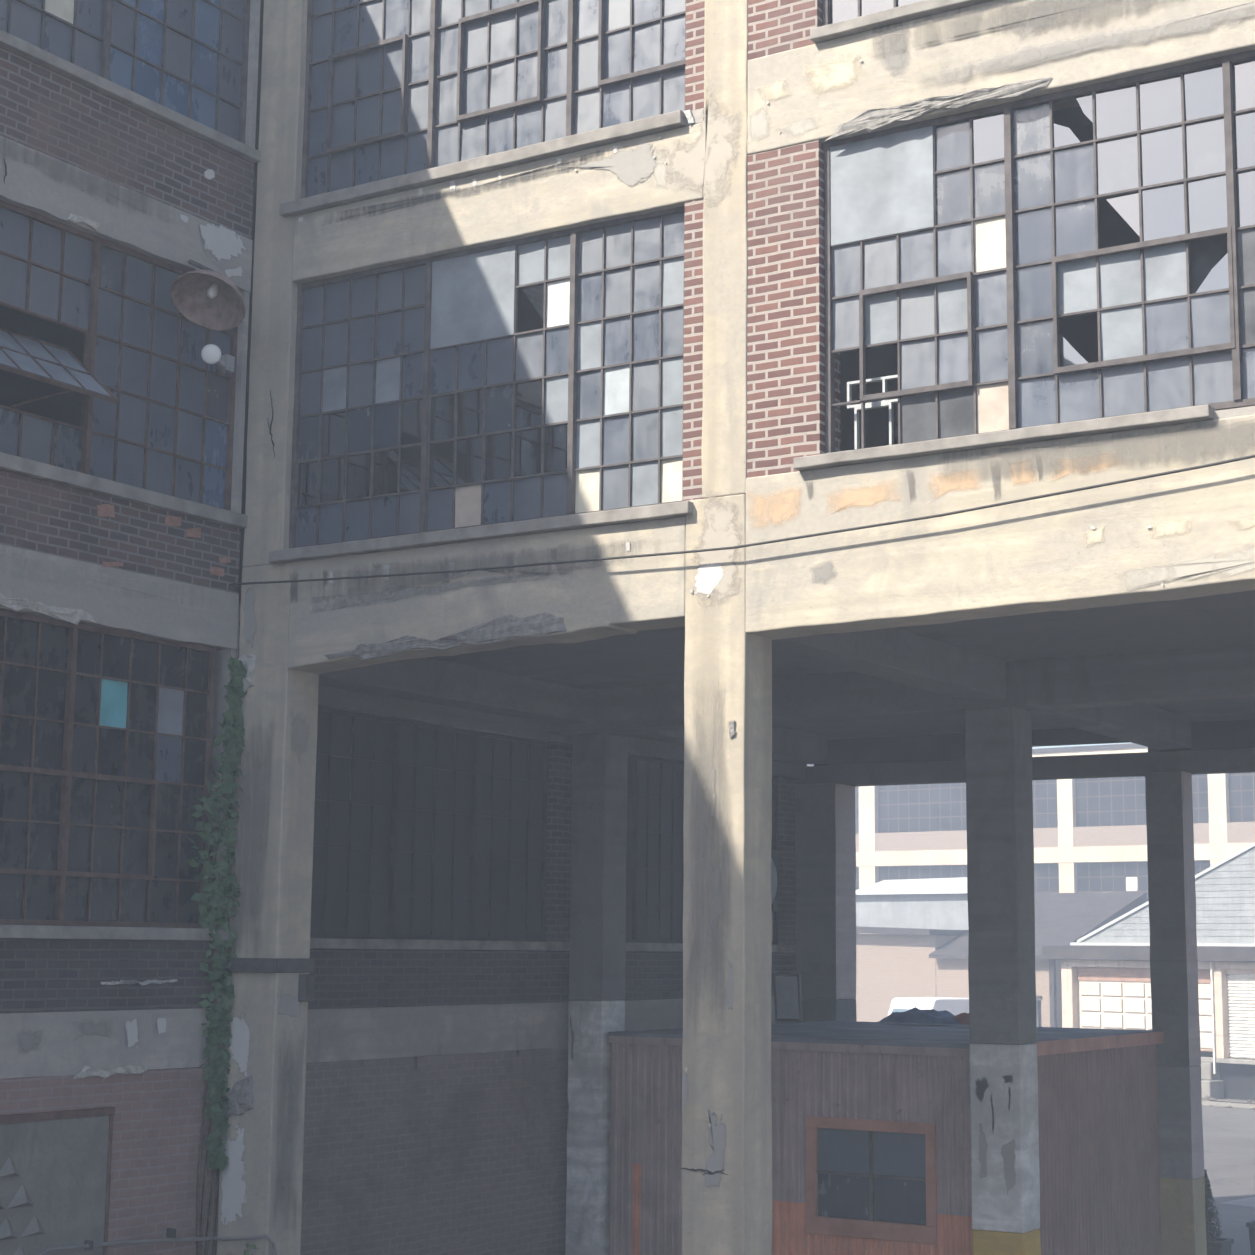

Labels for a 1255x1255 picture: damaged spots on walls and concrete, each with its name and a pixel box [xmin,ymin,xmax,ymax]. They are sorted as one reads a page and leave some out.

leakage [882,29,907,69]
leakage [945,0,1255,79]
peeling [568,136,667,187]
peeling [180,214,246,278]
crack [267,390,275,458]
peeling [690,557,729,597]
spalling [73,1065,149,1079]
peeling [220,1014,254,1228]
peeling [705,1109,726,1187]
peeling [978,1123,1016,1195]